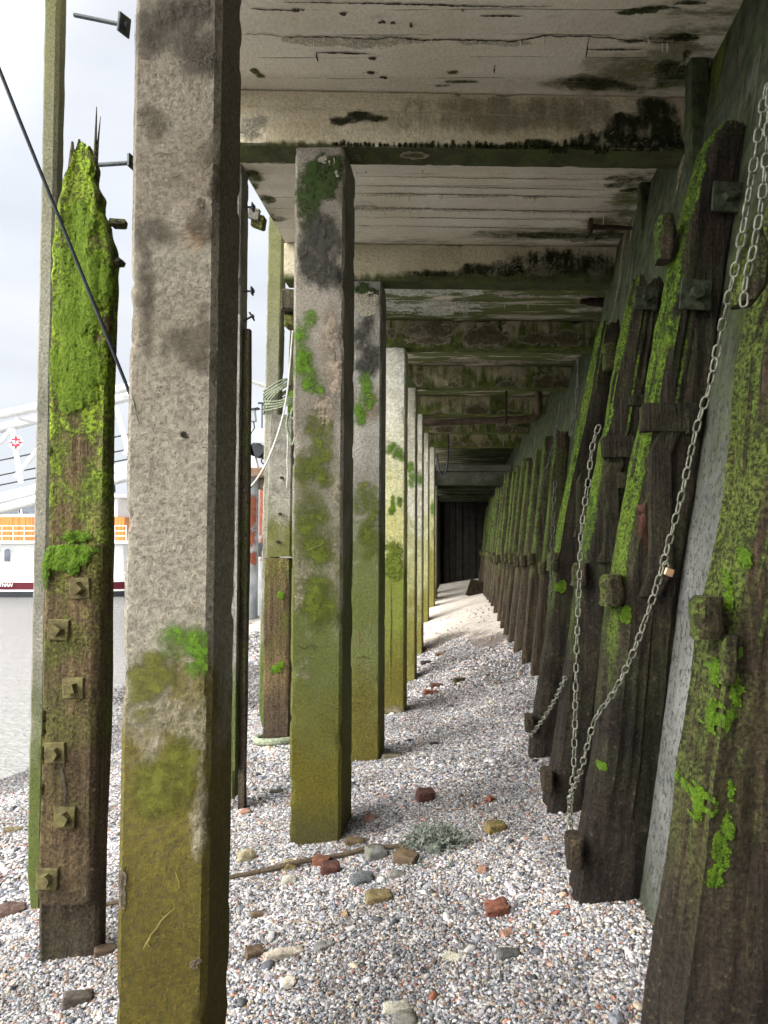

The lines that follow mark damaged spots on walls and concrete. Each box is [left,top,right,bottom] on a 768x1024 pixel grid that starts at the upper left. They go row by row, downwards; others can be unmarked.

leakage [284,35,424,49]
crack [248,2,693,62]
leakage [330,33,699,192]
leakage [297,212,343,290]
leakage [409,209,637,305]
leakage [354,289,593,388]